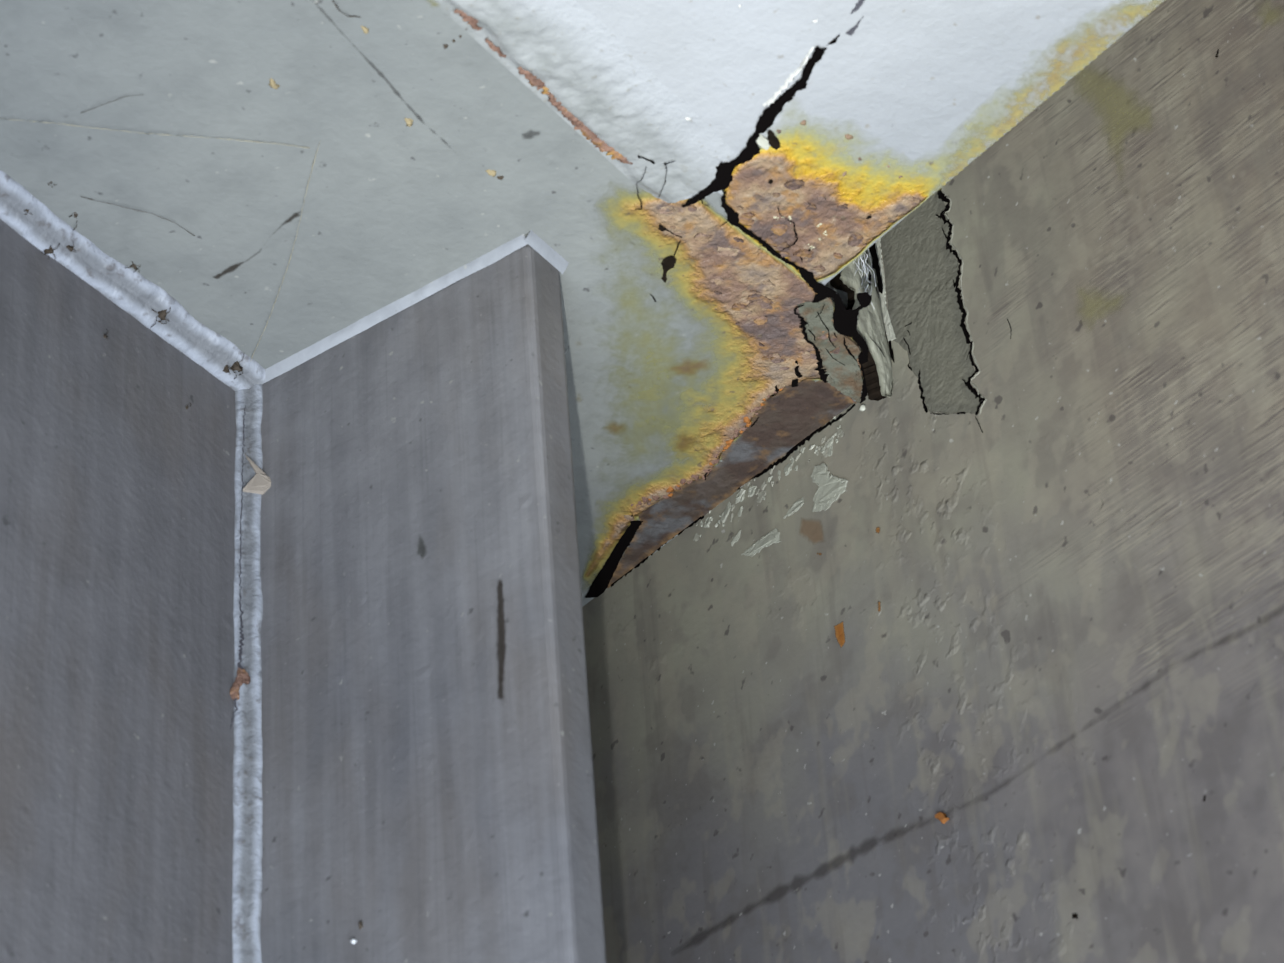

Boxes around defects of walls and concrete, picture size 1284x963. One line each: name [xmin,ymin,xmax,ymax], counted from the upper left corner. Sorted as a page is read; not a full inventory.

crack [585,515,704,598]
spalling [607,268,865,588]
crack [635,0,987,490]
rust [583,1,1156,584]
spalling [867,190,980,414]